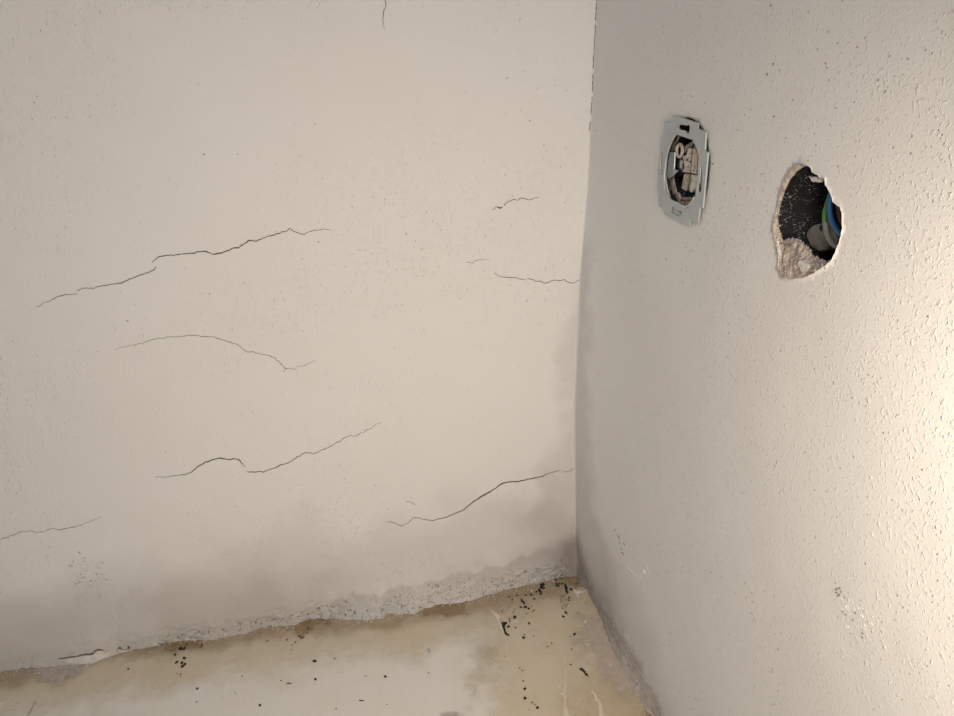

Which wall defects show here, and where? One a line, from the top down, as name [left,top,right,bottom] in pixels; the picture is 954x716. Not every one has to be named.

crack [38,228,329,307]
crack [467,259,579,284]
crack [117,335,313,372]
crack [156,422,381,478]
crack [392,468,574,526]
leakage [0,559,663,716]